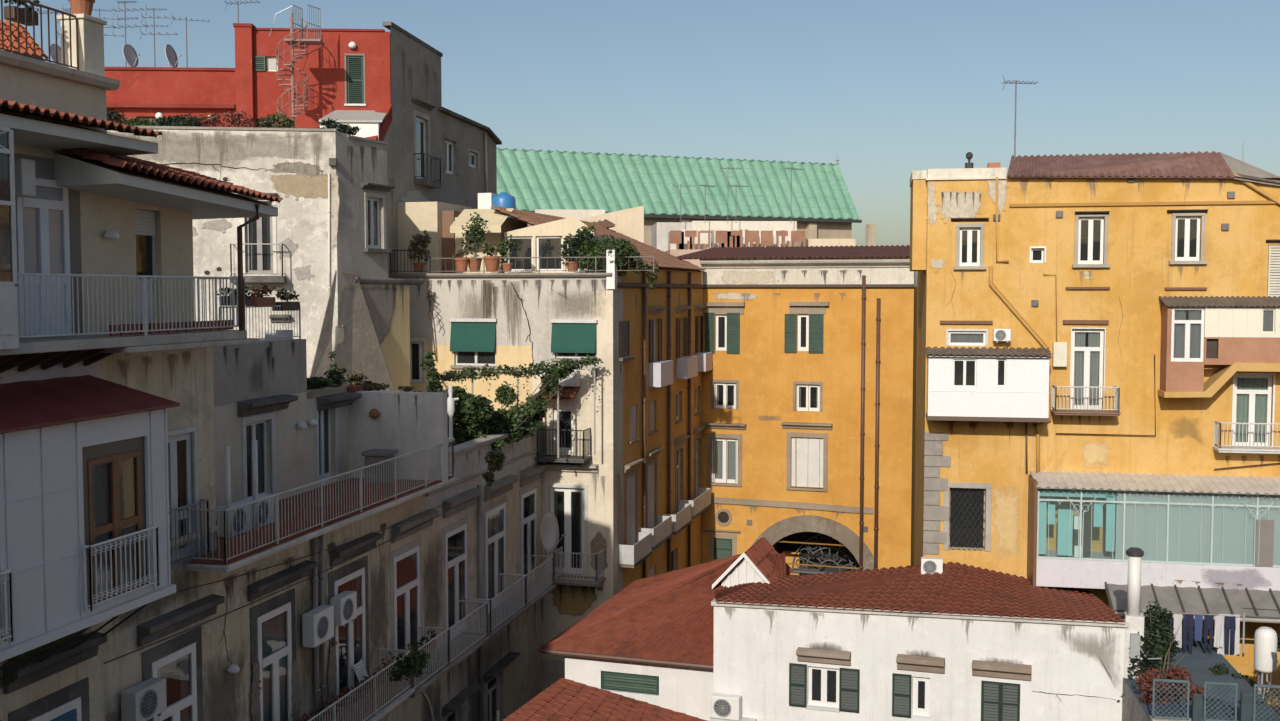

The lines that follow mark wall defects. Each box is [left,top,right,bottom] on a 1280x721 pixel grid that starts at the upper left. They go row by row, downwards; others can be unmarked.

leakage [112,132,308,170]
spalling [263,160,339,249]
peeling [926,179,1009,225]
leakage [386,280,506,319]
leakage [523,279,606,301]
leakage [1177,570,1268,591]